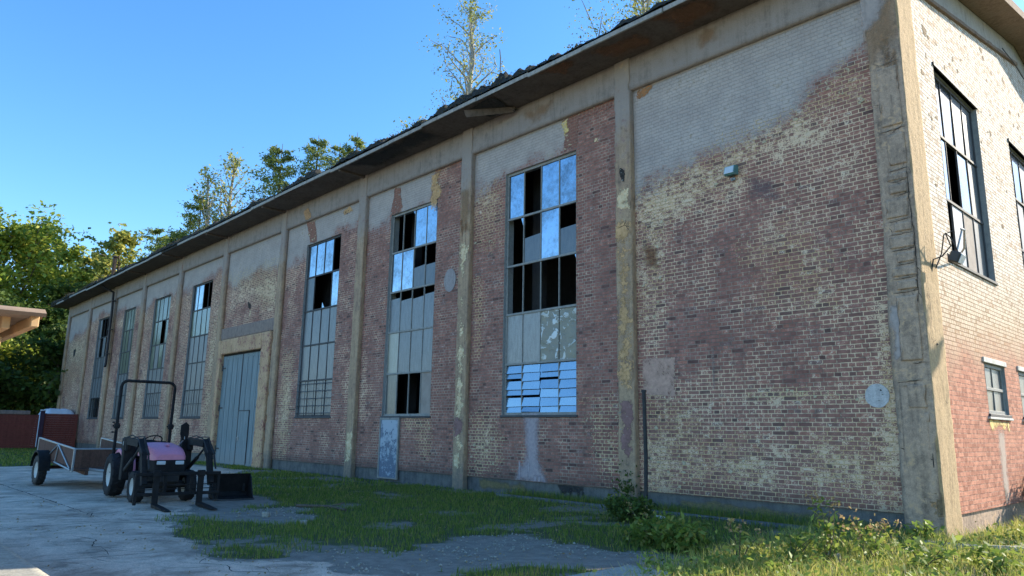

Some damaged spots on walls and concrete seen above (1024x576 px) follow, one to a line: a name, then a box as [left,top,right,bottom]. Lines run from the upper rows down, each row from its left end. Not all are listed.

peeling [452,175,508,477]
water stain [480,414,545,491]
peeling [578,60,902,509]